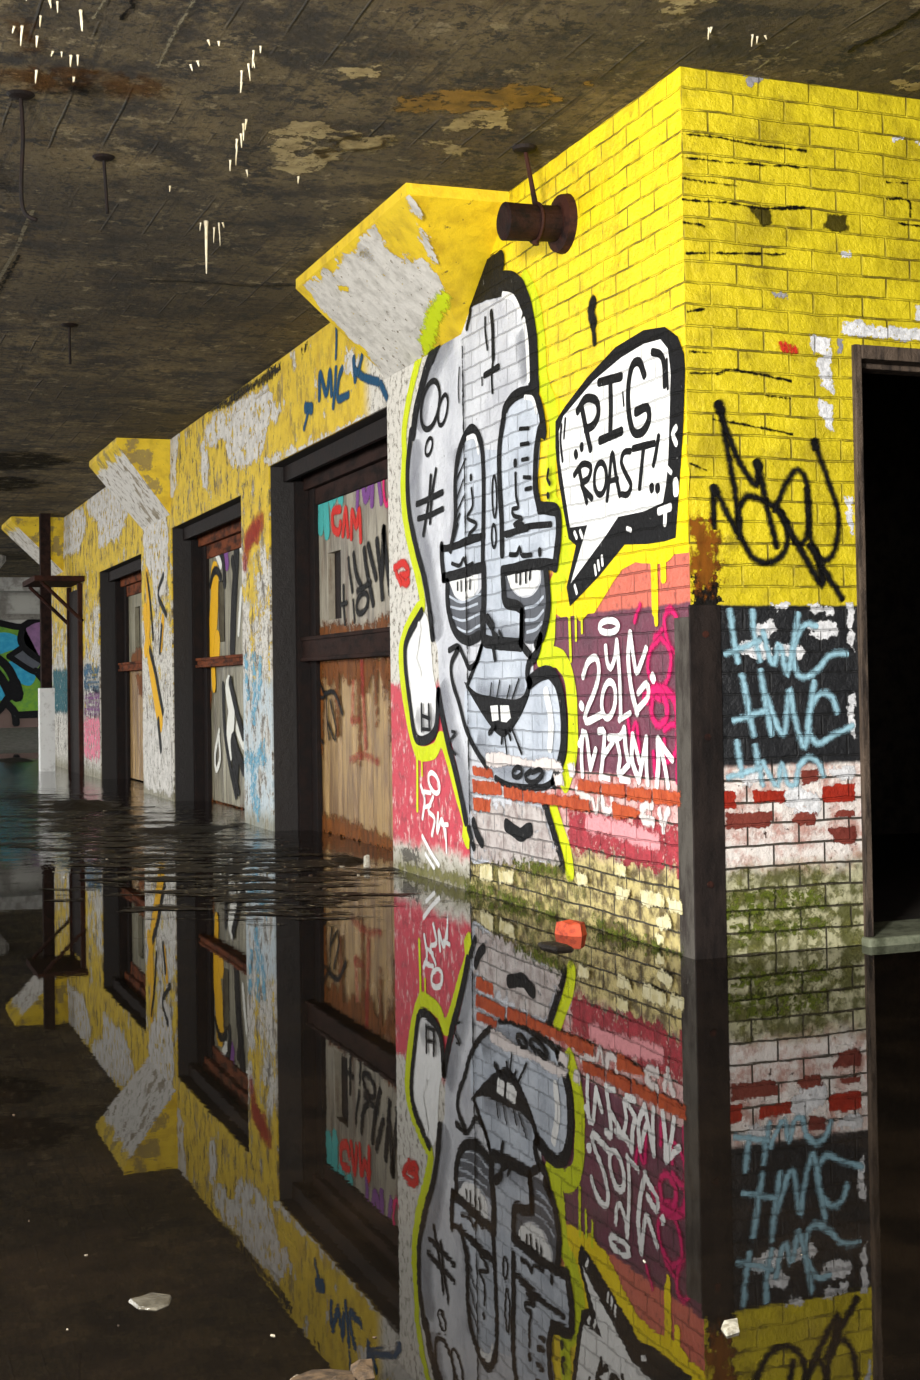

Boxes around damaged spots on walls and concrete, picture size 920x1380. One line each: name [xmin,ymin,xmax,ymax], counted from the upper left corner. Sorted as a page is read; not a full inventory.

crack [119,0,135,20]
peeling [338,64,381,79]
peeling [262,119,397,175]
peeling [392,83,564,155]
peeling [304,195,445,380]
peeling [809,305,920,432]
peeling [170,433,180,498]
peeling [200,383,386,491]
peeling [844,496,854,535]
peeling [739,601,856,660]
peeling [846,694,857,739]